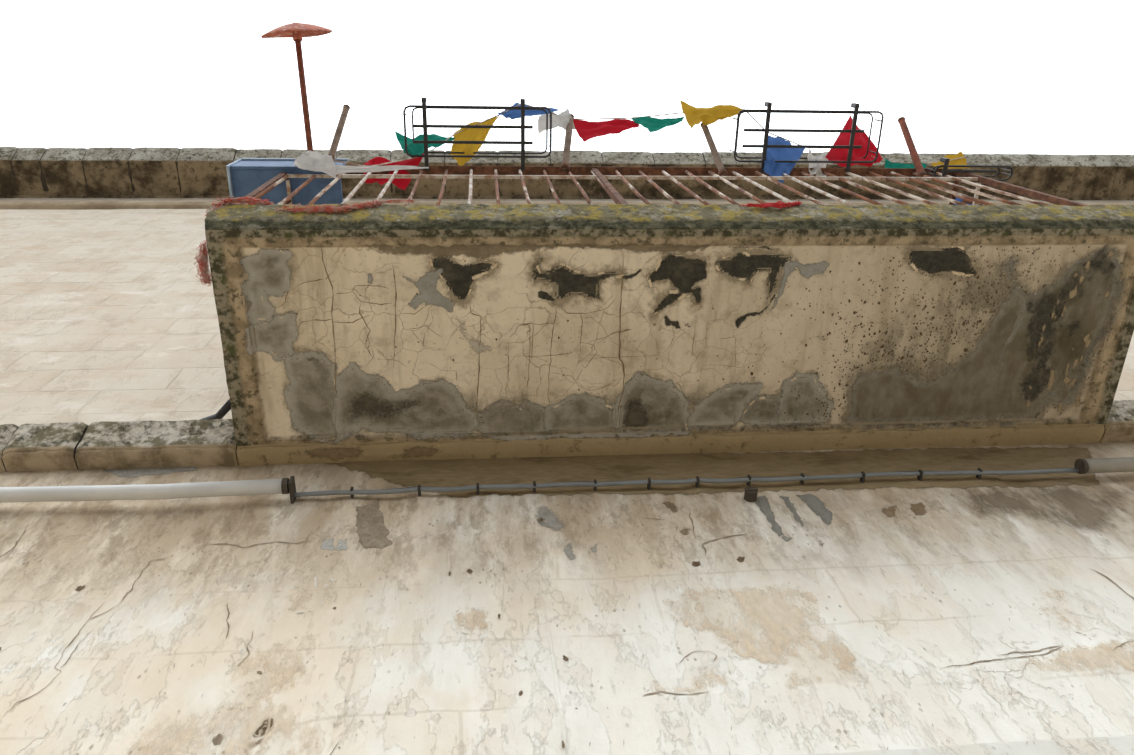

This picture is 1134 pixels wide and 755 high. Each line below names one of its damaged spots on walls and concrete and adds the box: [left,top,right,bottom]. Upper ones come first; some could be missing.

crack [277,241,482,428]
peeling [239,246,834,443]
crack [508,269,765,426]
damp [748,246,1126,431]
peeling [904,245,980,279]
crack [643,689,709,697]
crack [944,646,1063,668]